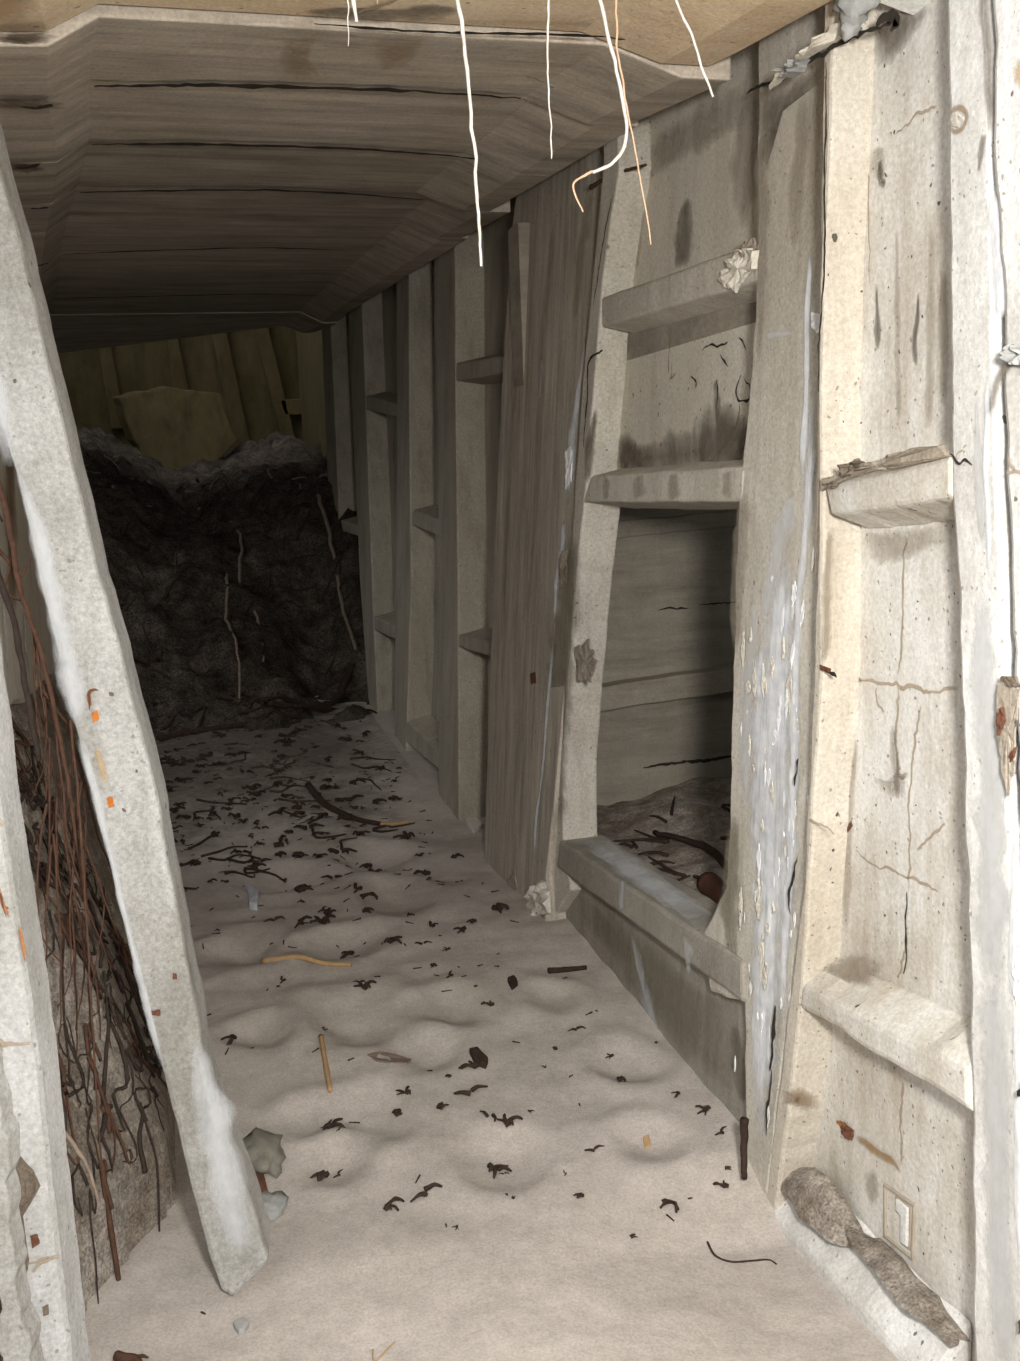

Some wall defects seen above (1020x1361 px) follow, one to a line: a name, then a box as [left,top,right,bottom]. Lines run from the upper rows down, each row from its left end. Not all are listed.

water stain [620,401,745,496]
crack [746,9,900,569]
corrosion [87,688,99,722]
peeling [738,259,951,1128]
crack [826,546,951,976]
spalling [996,676,1020,796]